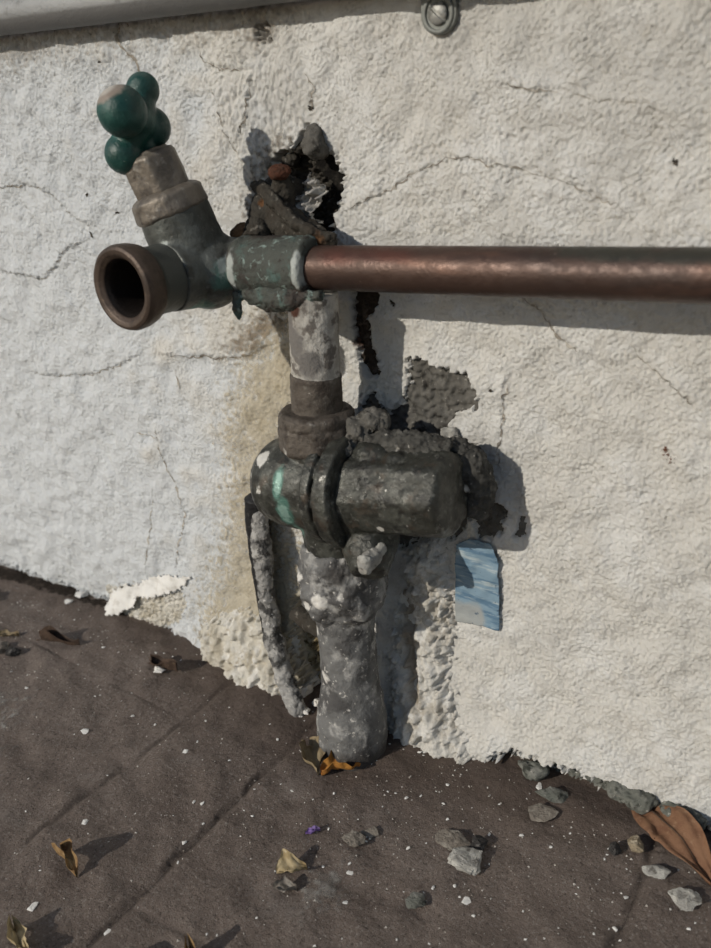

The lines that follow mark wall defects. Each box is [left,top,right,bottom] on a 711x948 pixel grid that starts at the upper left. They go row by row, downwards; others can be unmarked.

spalling [281,123,346,232]
flaking render [362,356,493,450]
crack [137,430,186,565]
leakage [194,311,291,630]
flaking render [447,503,508,539]
flaking render [515,516,527,537]
leakage [269,521,319,685]